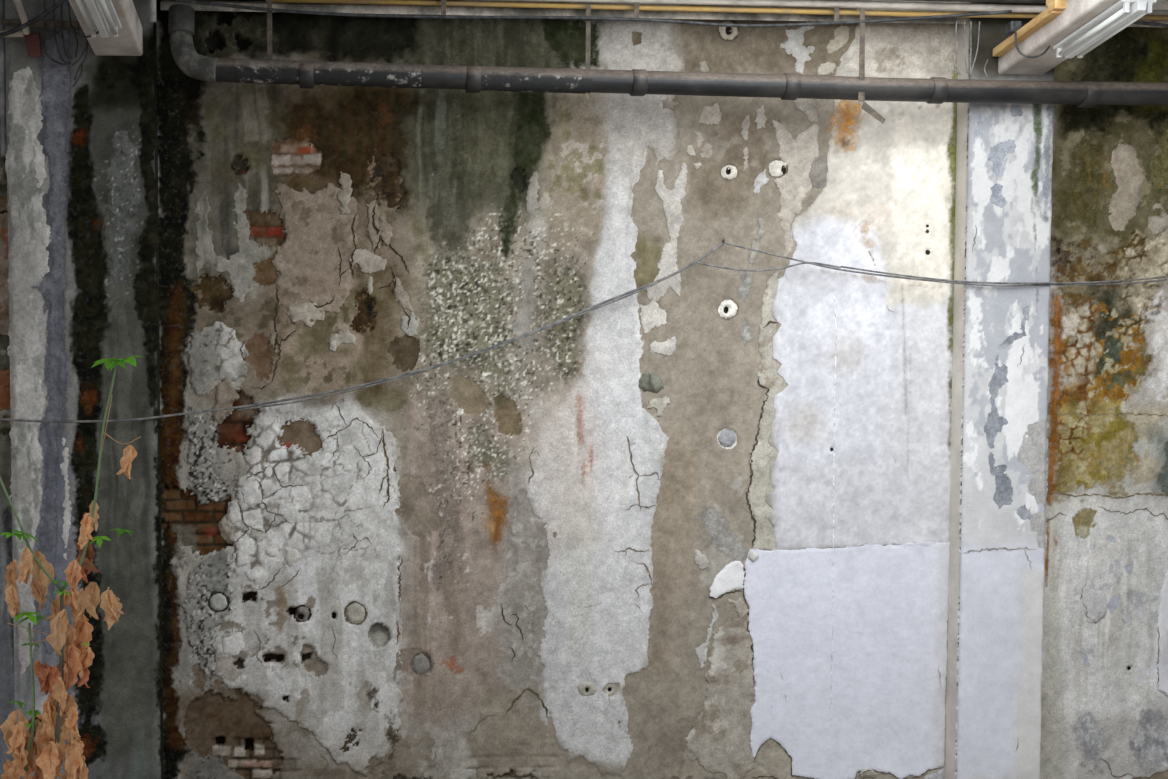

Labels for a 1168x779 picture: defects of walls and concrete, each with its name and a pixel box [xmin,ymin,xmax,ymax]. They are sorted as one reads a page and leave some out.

leakage [192,0,418,63]
peeling [680,4,957,79]
leakage [1071,28,1168,83]
leakage [1044,104,1168,221]
leakage [194,184,261,302]
crack [309,202,411,329]
peeling [0,66,52,675]
peeling [486,95,956,779]
peeling [984,306,1049,549]
crack [211,285,404,777]
corrosion [487,483,506,544]
crack [710,376,769,681]